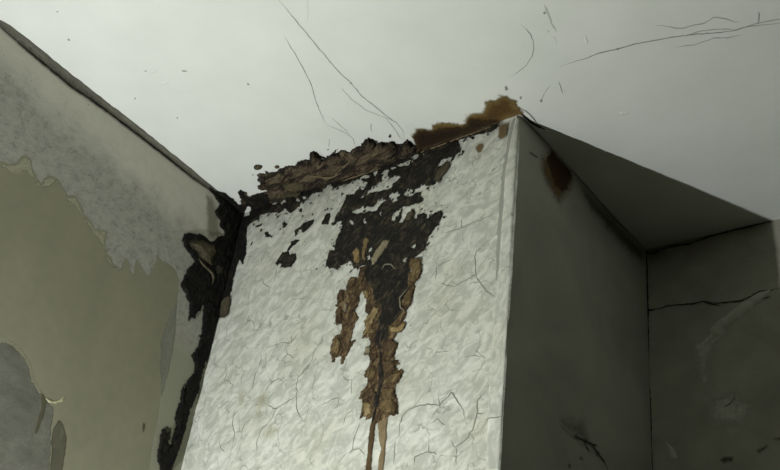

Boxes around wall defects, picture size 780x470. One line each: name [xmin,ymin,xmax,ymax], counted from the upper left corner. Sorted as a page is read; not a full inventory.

peeling [0,28,225,470]
leakage [157,123,499,470]
flaking render [252,134,422,198]
crack [279,1,405,147]
rust [412,97,523,153]
crack [530,125,779,349]
crack [563,12,779,66]